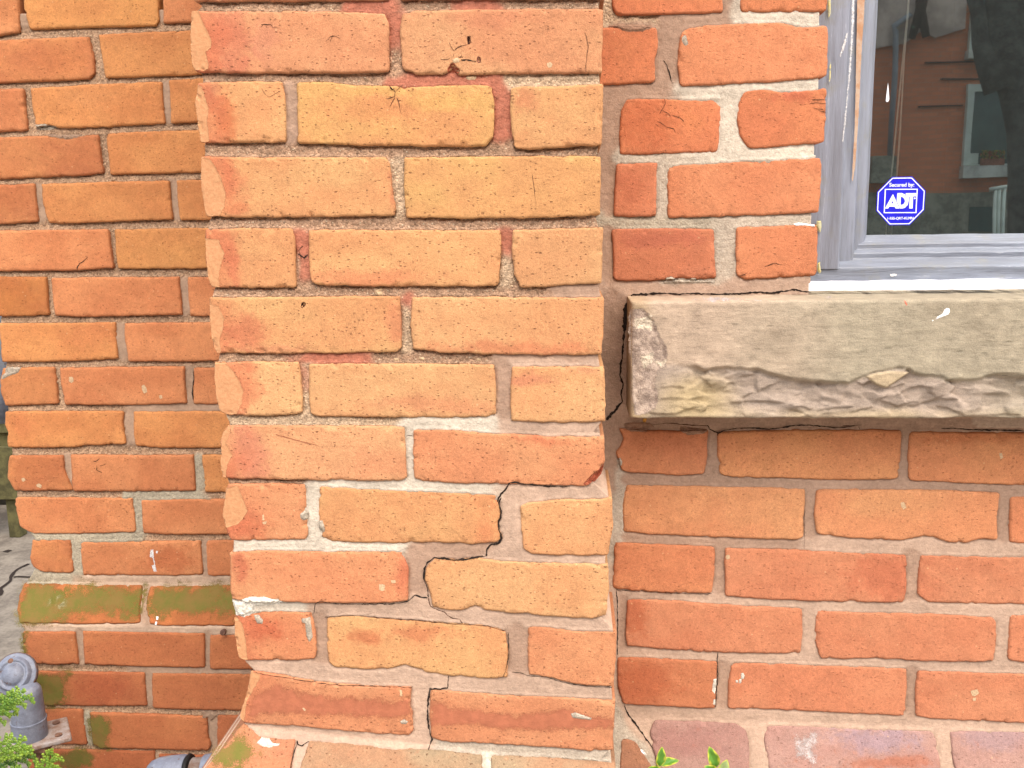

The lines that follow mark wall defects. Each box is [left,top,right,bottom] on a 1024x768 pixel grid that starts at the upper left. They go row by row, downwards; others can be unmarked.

spalling [628,308,668,416]
crack [606,263,811,420]
crack [654,423,860,436]
crack [941,425,1022,433]
crack [314,481,653,749]